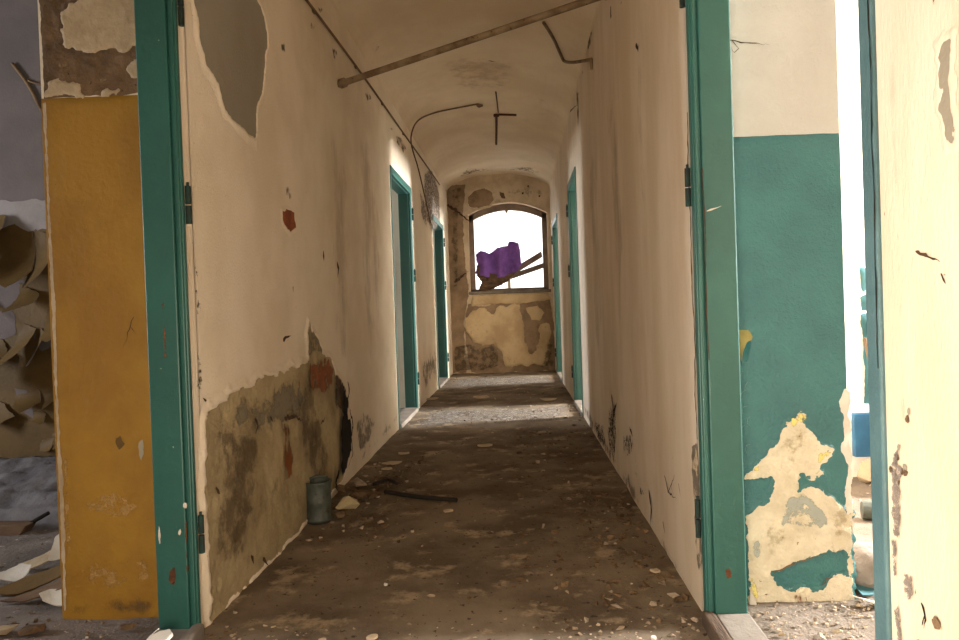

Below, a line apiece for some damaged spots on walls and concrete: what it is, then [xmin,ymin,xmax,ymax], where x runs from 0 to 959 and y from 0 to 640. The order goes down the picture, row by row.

peeling [190,0,270,152]
flaking render [0,0,138,610]
flaking render [280,205,297,237]
flaking render [447,184,556,373]
peeling [739,330,753,365]
peeling [859,267,869,403]
flaking render [743,389,857,614]
peeling [889,444,913,600]
peeling [894,606,902,640]